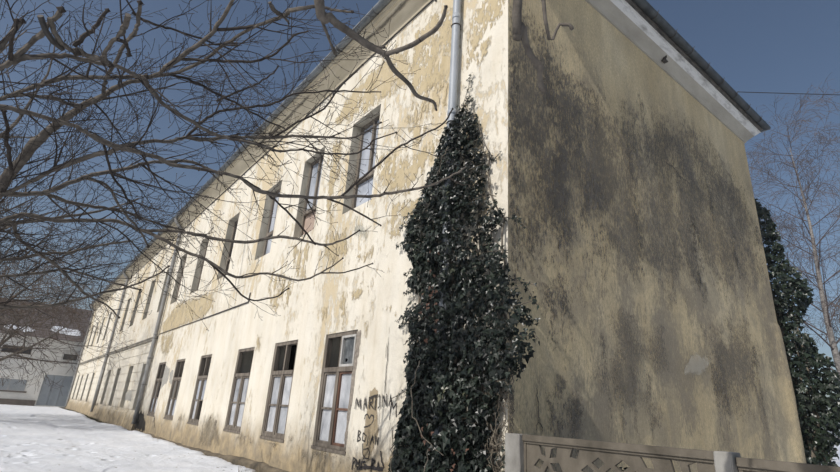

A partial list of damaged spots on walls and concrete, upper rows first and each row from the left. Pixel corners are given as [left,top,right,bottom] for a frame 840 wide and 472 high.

peeling [335,0,505,241]
peeling [324,136,347,265]
damp [507,3,764,343]
peeling [161,292,214,354]
peeling [268,243,309,311]
peeling [339,283,369,328]
spalling [160,366,174,389]
damp [596,309,669,440]
damp [701,316,770,439]
damp [134,410,145,432]
damp [200,417,218,445]